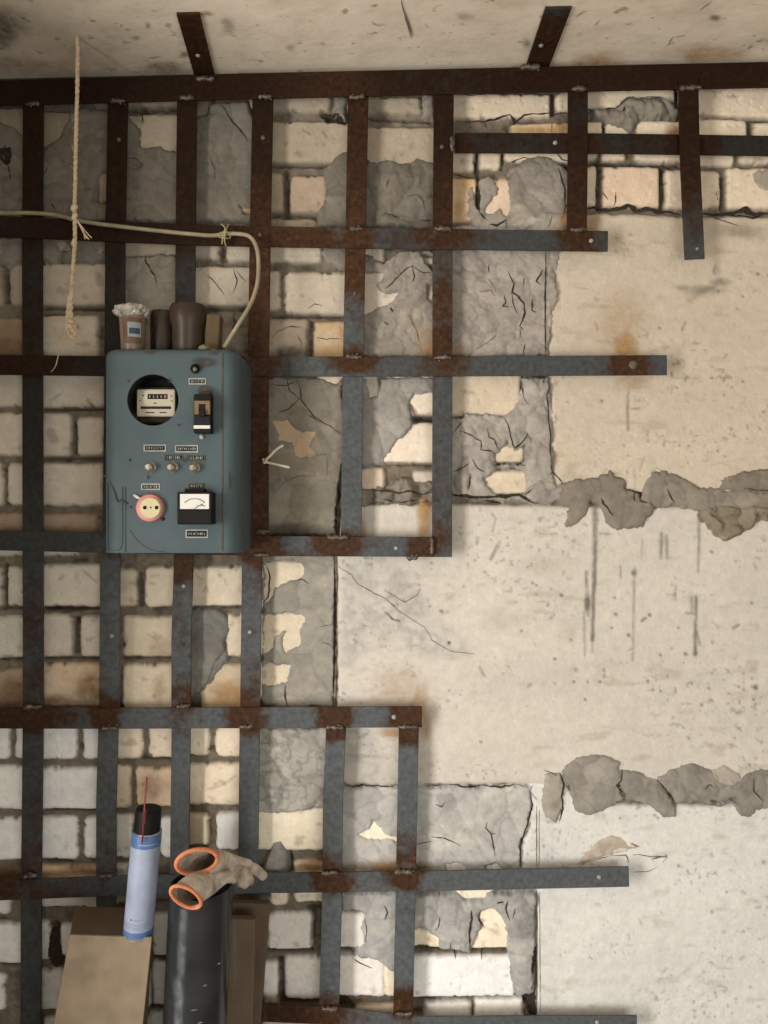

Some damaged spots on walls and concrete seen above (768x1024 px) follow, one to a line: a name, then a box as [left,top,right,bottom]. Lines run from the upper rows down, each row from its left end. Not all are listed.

peeling [453,212,567,230]
crack [454,90,768,356]
peeling [452,250,560,356]
peeling [452,376,557,503]
crack [263,565,309,603]
peeling [261,556,338,707]
crack [323,556,471,702]
leakage [585,542,596,640]
peeling [342,784,398,871]
peeling [416,783,532,870]
flaking render [578,835,666,873]
peeling [415,889,538,1015]